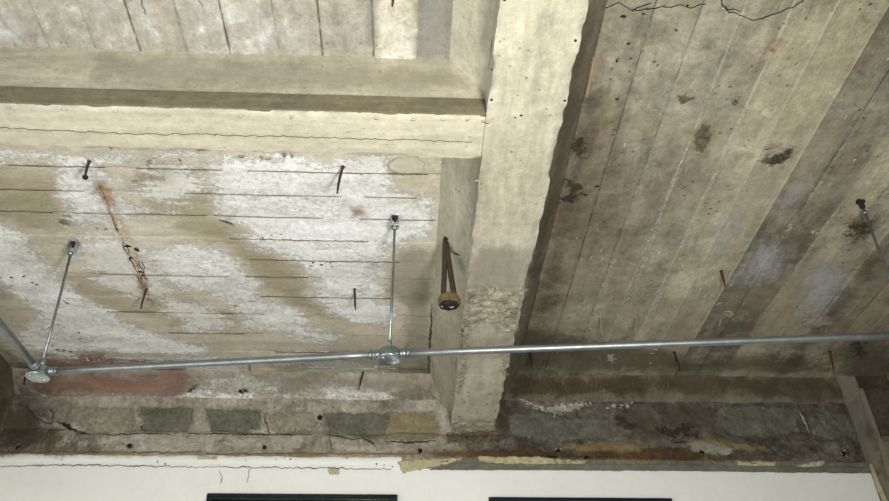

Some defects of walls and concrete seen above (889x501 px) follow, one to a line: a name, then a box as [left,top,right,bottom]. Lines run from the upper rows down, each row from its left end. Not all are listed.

crack [606,0,803,21]
water stain [762,145,795,165]
water stain [145,190,319,312]
crack [1,403,389,484]